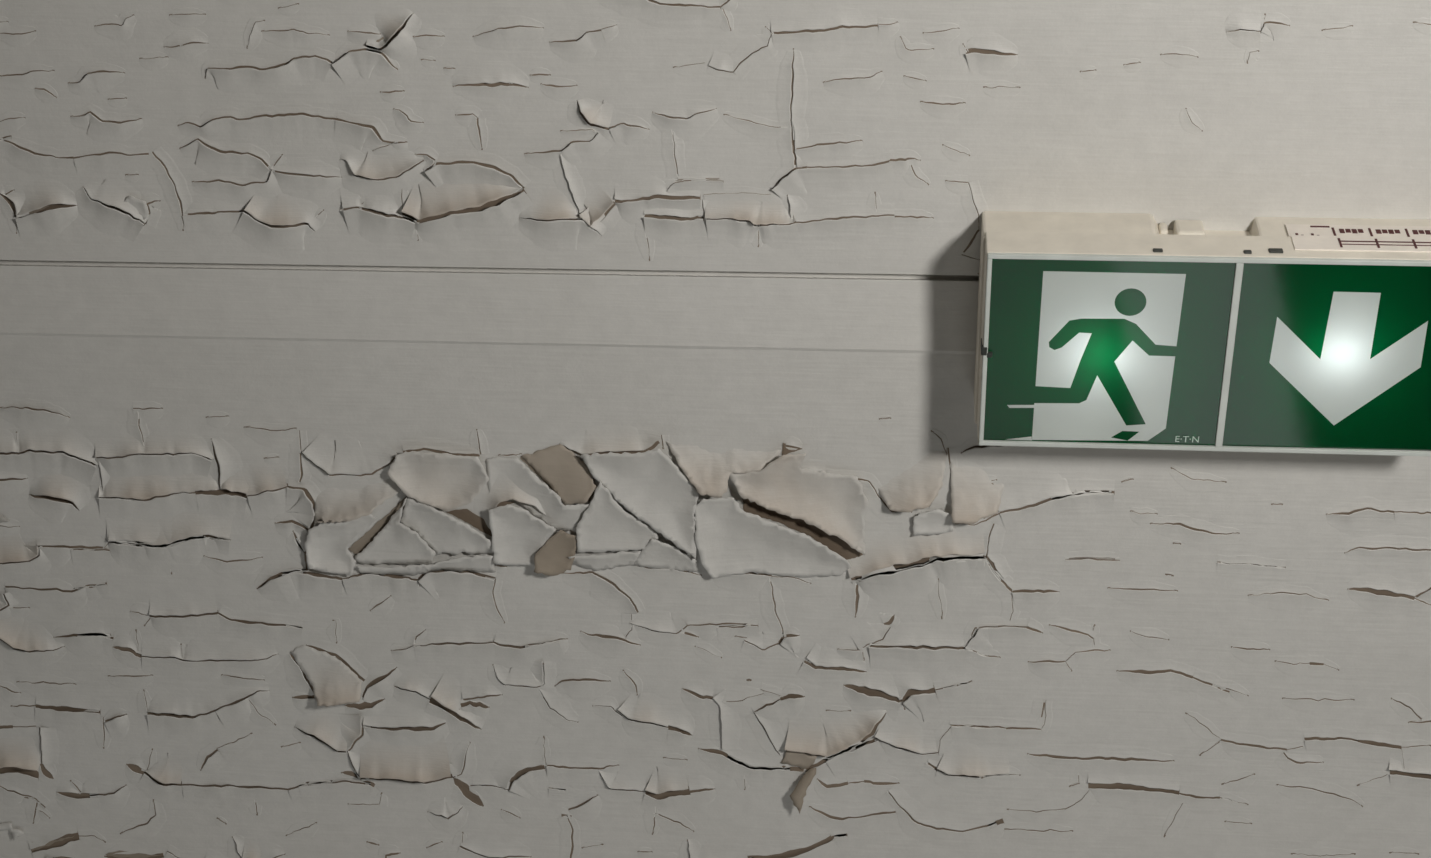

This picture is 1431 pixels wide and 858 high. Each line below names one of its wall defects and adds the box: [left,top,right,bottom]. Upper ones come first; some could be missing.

peeling [201,5,422,95]
peeling [0,178,161,242]
peeling [182,98,896,261]
peeling [0,420,1115,858]
crack [533,465,1431,858]